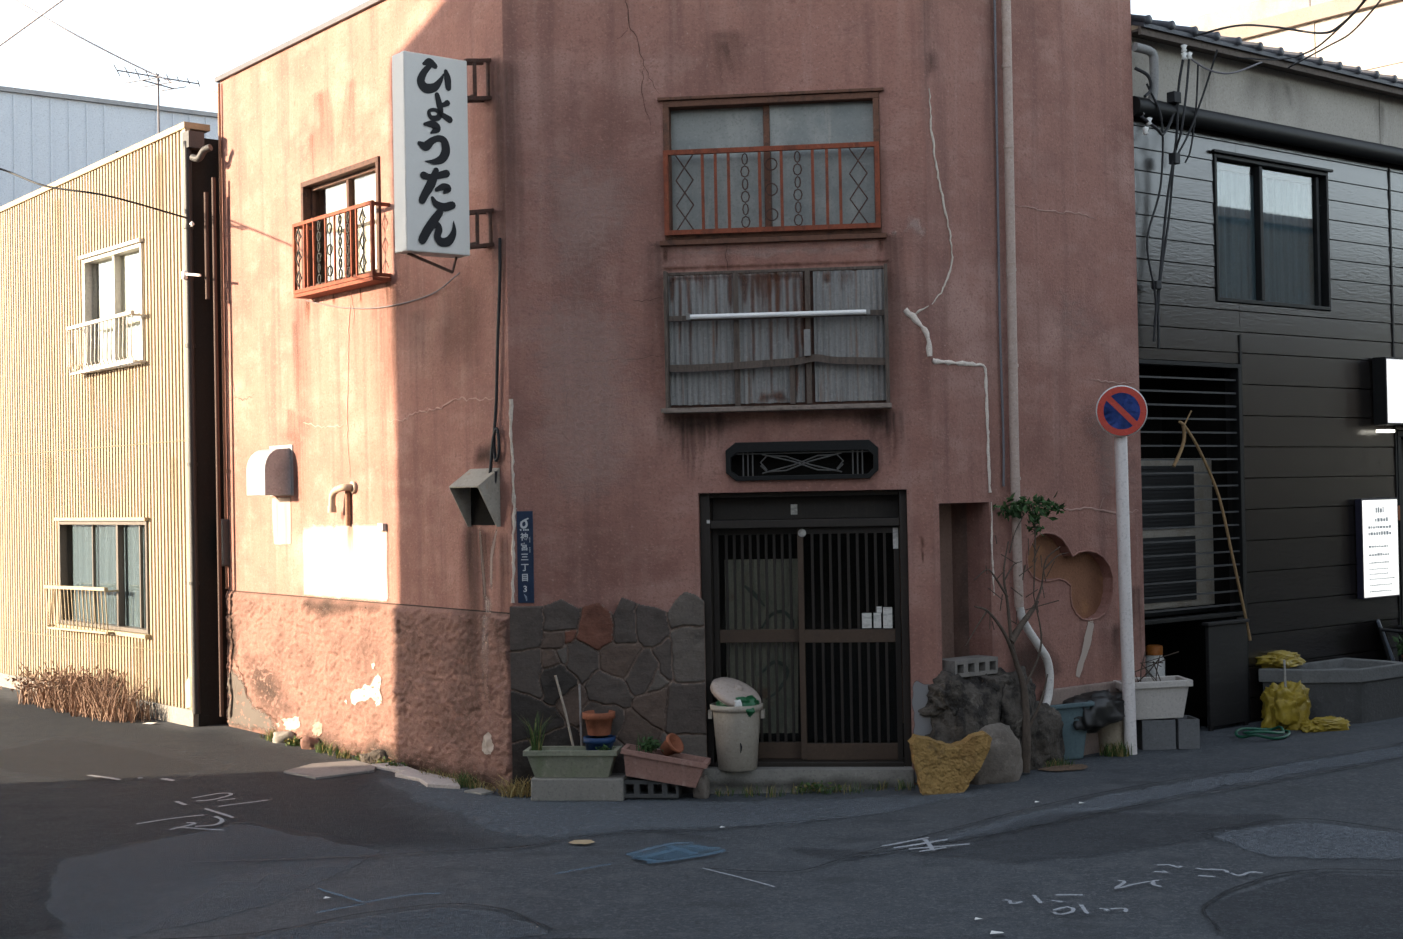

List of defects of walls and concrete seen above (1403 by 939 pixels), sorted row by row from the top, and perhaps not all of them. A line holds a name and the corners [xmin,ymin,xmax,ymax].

crack [621,0,661,132]
rust [664,251,804,399]
flaking render [344,663,382,706]